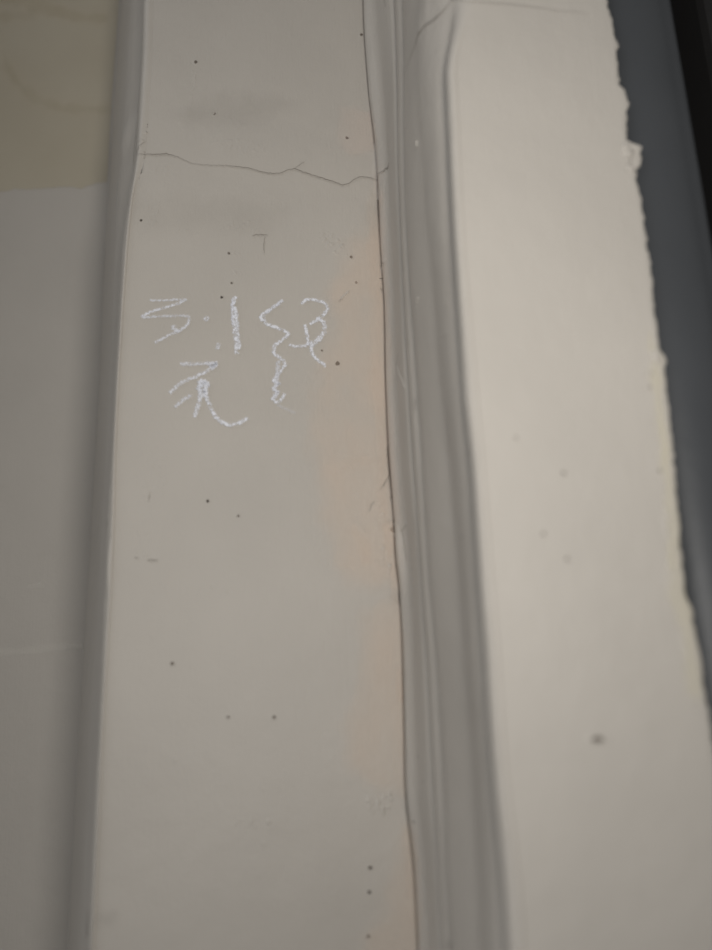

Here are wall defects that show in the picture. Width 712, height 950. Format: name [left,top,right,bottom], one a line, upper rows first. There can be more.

crack [135,141,389,186]